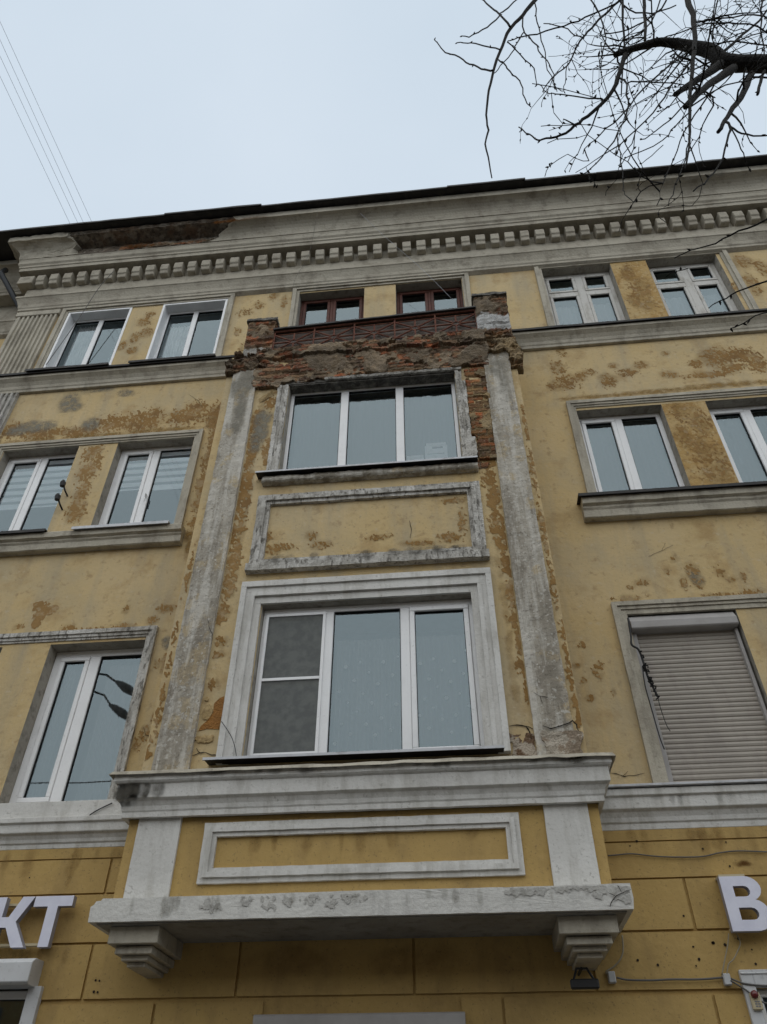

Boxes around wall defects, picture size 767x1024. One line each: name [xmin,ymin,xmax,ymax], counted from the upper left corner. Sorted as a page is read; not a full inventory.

peeling [546,348,647,391]
peeling [662,346,767,379]
peeling [0,398,221,532]
flaking render [212,293,529,705]
peeling [669,405,737,483]
peeling [520,404,605,728]
peeling [16,600,59,629]
flaking render [509,733,537,756]